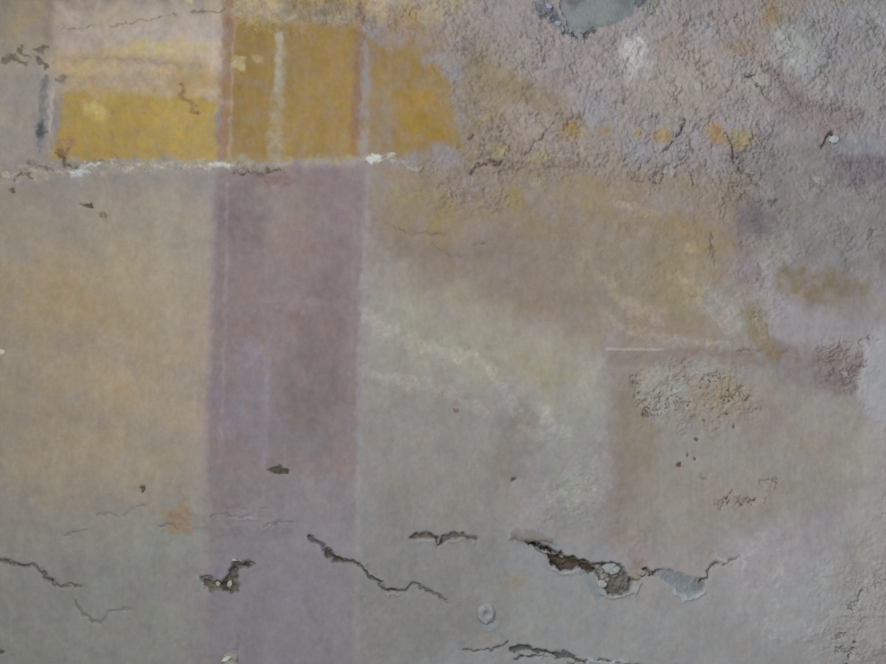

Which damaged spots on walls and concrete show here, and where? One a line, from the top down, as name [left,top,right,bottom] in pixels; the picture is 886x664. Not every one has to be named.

flaking render [450,0,868,251]
flaking render [0,152,302,194]
flaking render [354,148,427,181]
flaking render [813,336,869,396]
crack [0,558,131,625]
flaking render [196,558,256,595]
crack [308,534,448,603]
crack [409,531,478,549]
flaking render [509,528,707,604]
crack [462,640,621,664]